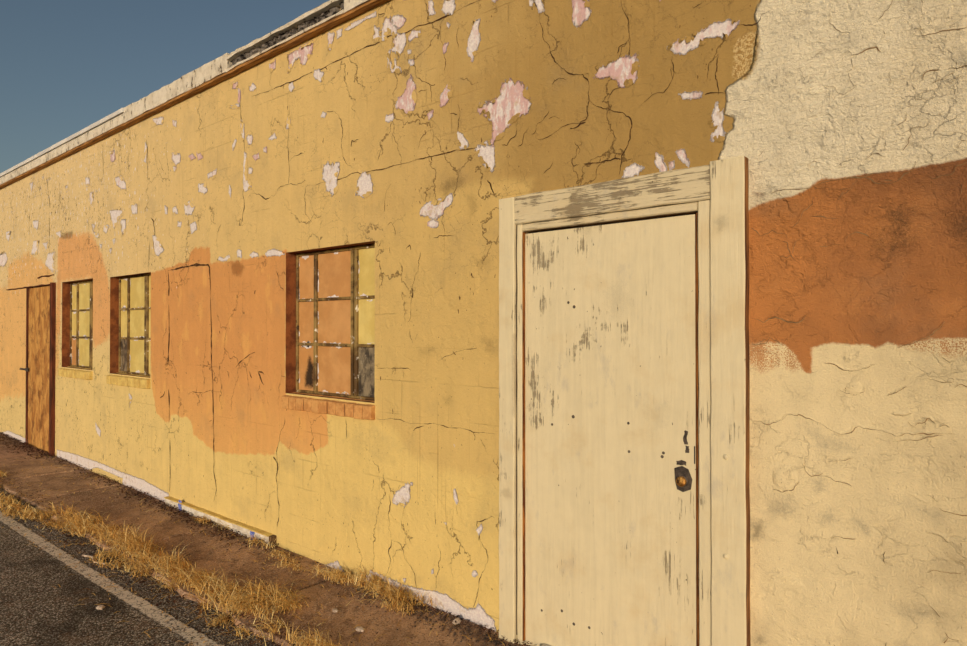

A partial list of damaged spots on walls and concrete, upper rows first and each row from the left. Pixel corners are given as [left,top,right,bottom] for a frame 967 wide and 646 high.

spalling [226,0,421,192]
crack [240,1,477,127]
peeling [457,78,532,172]
crack [504,2,674,174]
peeling [593,53,640,88]
peeling [666,16,740,55]
crack [705,56,723,95]
crack [216,111,477,340]
crack [148,218,264,495]
peeling [57,449,169,502]
crack [373,463,441,588]
peeling [362,570,497,631]